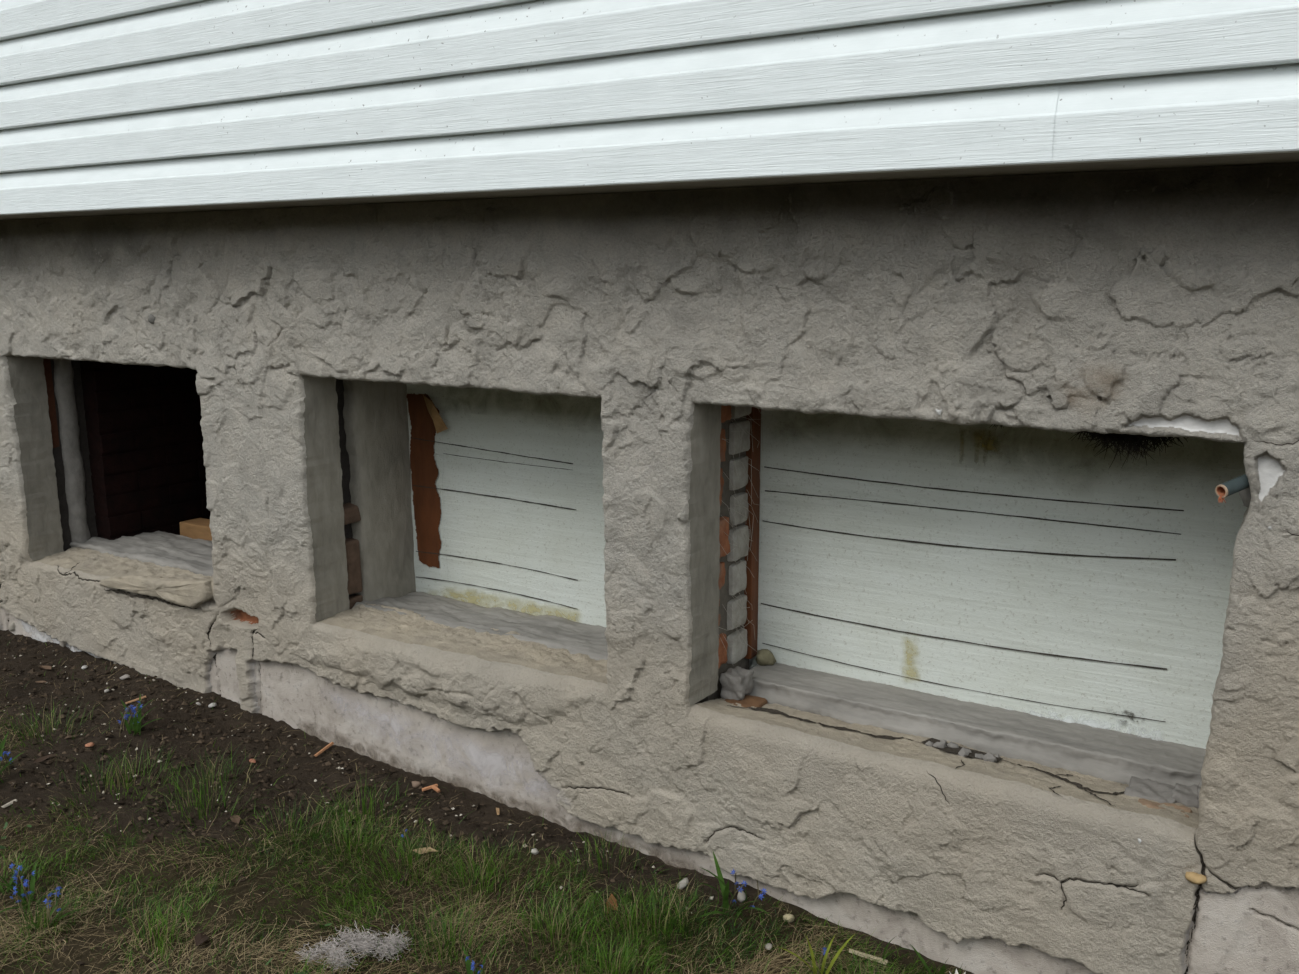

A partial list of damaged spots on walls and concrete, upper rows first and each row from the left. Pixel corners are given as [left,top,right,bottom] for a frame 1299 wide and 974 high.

crack [563,786,629,795]
crack [1037,874,1146,909]
crack [1184,785,1298,974]